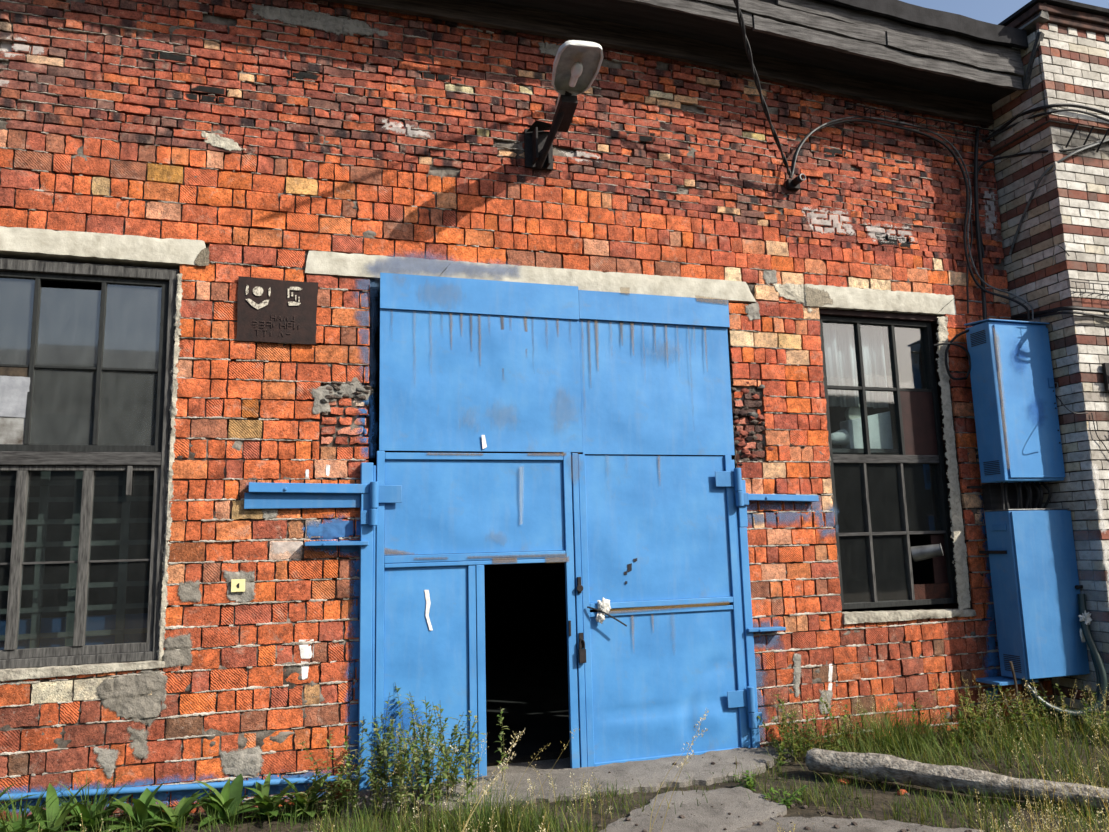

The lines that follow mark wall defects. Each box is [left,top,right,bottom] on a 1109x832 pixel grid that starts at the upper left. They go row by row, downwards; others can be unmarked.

corrosion [588,320,598,373]
spalling [320,381,372,402]